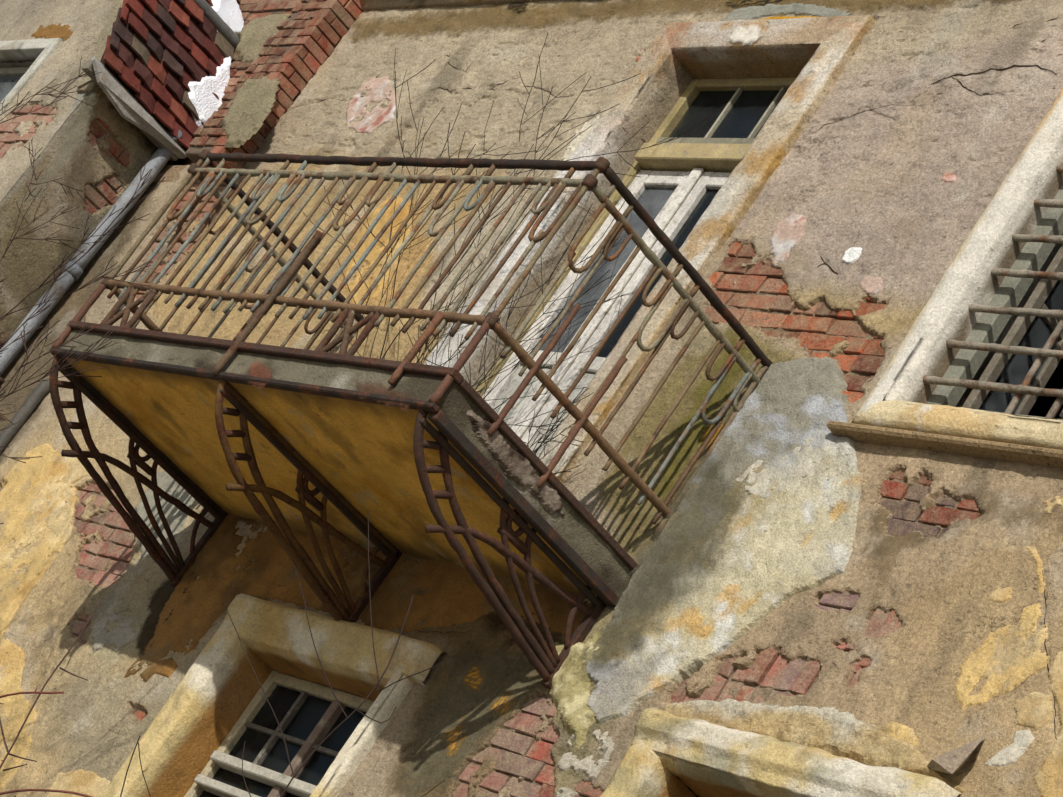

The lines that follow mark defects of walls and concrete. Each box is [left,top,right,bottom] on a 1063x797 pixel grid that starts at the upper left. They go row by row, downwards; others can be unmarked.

spalling [345,75,398,134]
crack [815,17,1061,132]
flaking render [83,118,130,213]
flaking render [705,213,888,403]
peeling [0,443,196,792]
peeling [72,514,592,682]
leakage [584,455,738,668]
flaking render [671,647,821,704]
flaking render [880,470,983,538]
peeling [954,546,1063,797]
peeling [47,769,110,797]
flaking render [455,696,615,797]